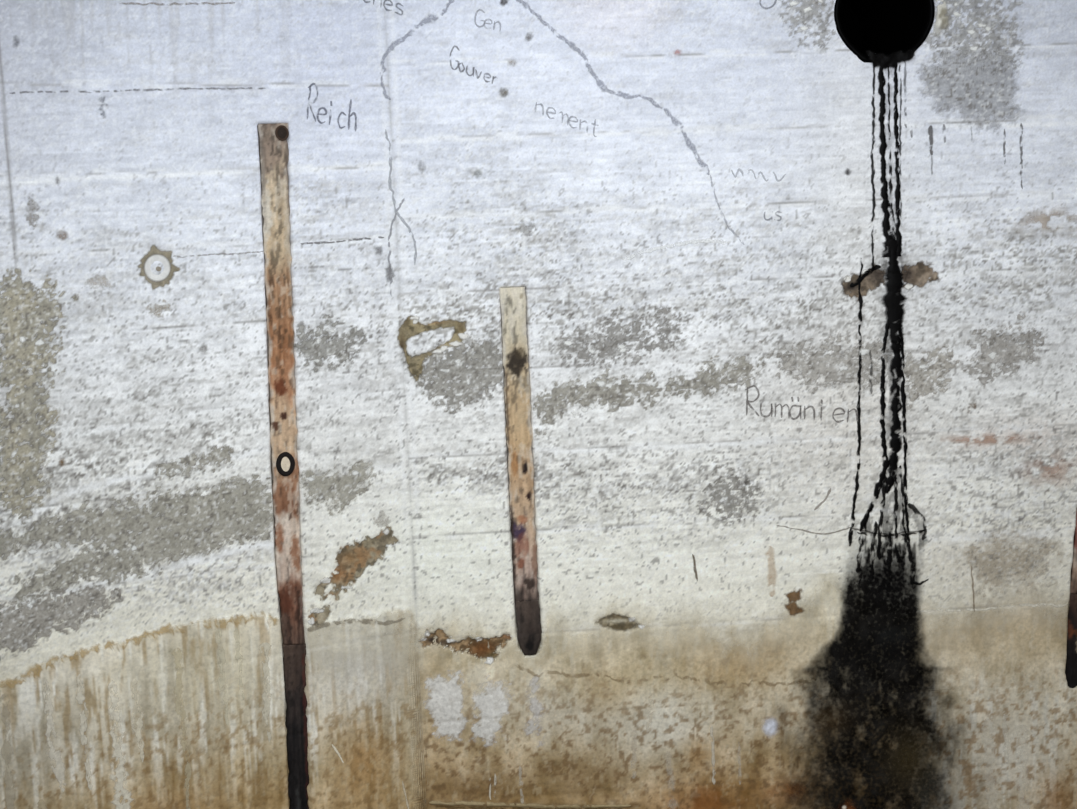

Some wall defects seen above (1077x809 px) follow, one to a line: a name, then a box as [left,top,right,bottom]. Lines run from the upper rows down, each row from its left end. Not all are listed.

water stain [928,125,946,155]
peeling [398,316,504,414]
spalling [842,265,885,301]
water stain [848,64,928,589]
spalling [901,261,939,290]
spalling [308,527,398,627]
water stain [0,616,290,809]
spalling [420,629,511,664]
water stain [304,584,844,809]
water stain [919,597,1077,809]